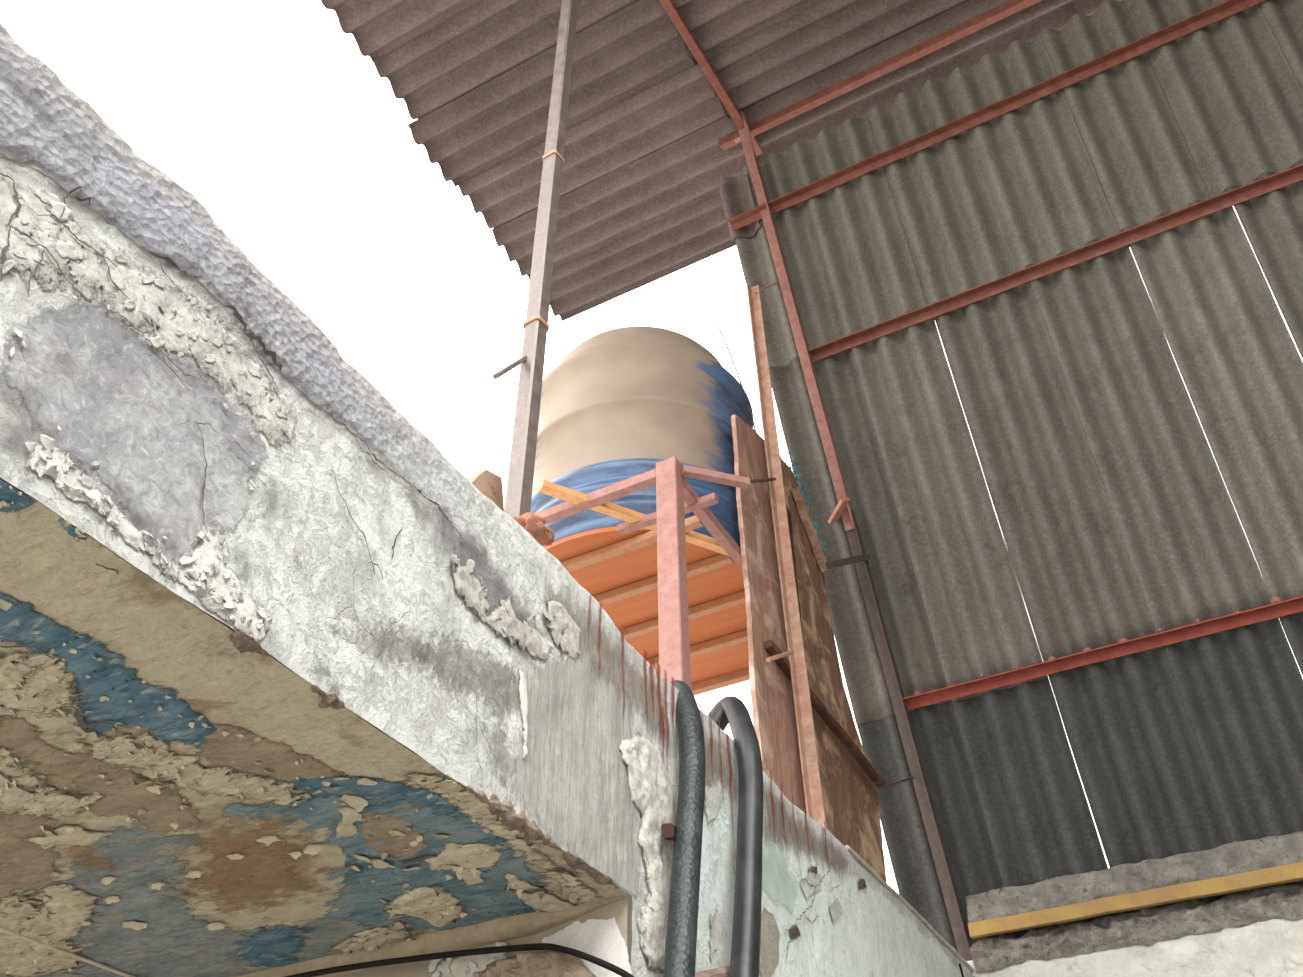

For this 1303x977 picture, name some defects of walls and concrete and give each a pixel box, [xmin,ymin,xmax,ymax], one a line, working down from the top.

peeling [0,168,297,657]
crack [0,153,475,554]
crack [330,463,403,578]
peeling [0,554,641,977]
corrosion [589,594,602,669]
corrosion [644,651,675,771]
corrosion [700,704,735,871]
peeling [759,908,801,977]